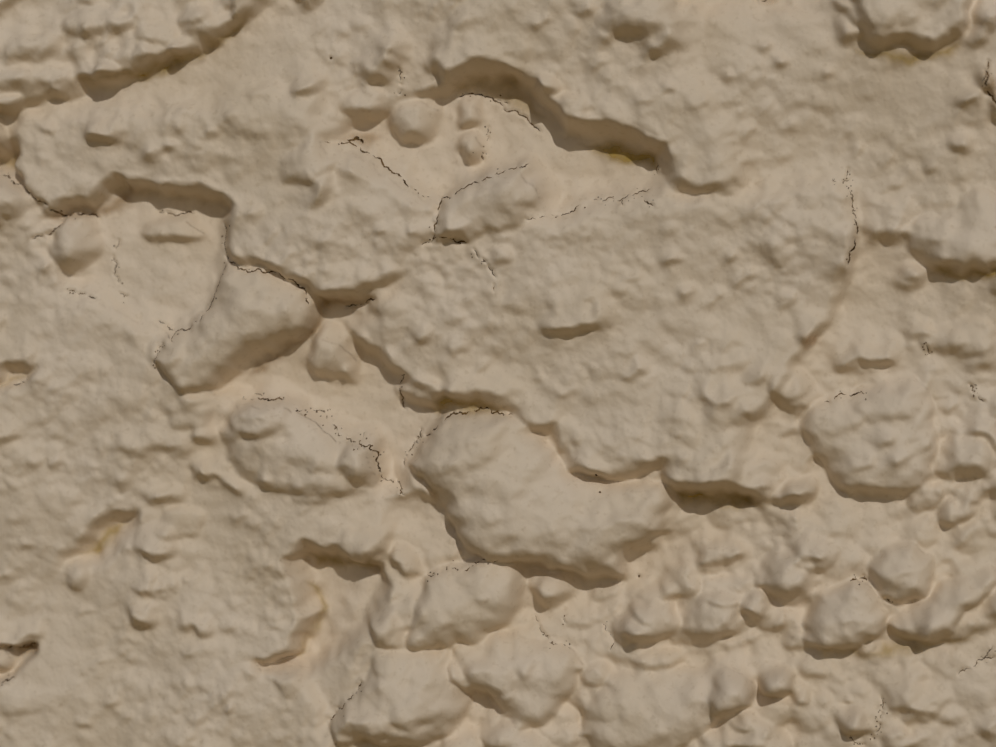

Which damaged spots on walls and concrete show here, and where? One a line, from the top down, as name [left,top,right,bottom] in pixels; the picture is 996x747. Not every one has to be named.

crack [459,93,540,131]
crack [4,173,99,239]
crack [327,126,528,289]
crack [528,165,659,220]
crack [833,171,859,263]
crack [153,223,309,368]
crack [242,393,512,495]